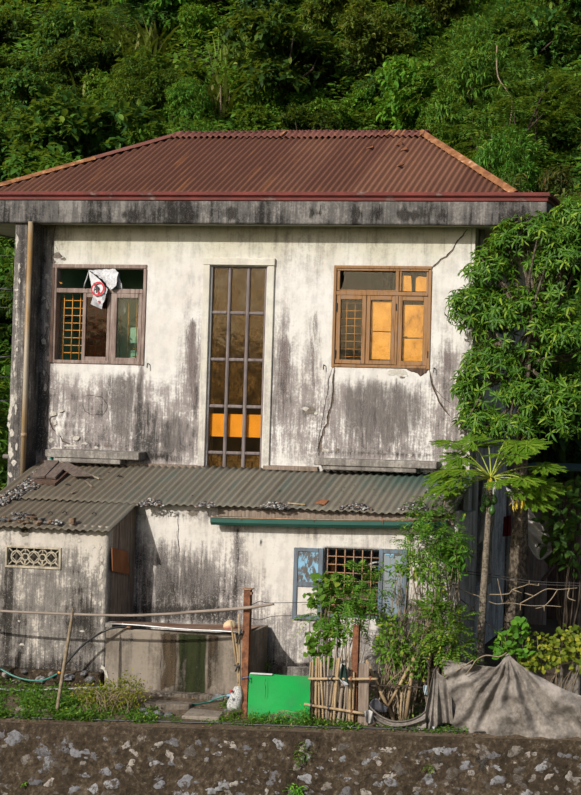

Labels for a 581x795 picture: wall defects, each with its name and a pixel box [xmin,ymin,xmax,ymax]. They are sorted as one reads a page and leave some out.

leakage [397,210,446,221]
crack [433,229,468,267]
leakage [110,377,141,435]
leakage [187,322,197,406]
leakage [281,337,290,400]
crack [316,368,335,458]
leakage [347,384,419,443]
crack [429,371,451,417]
leakage [65,592,92,629]
leakage [137,604,237,617]